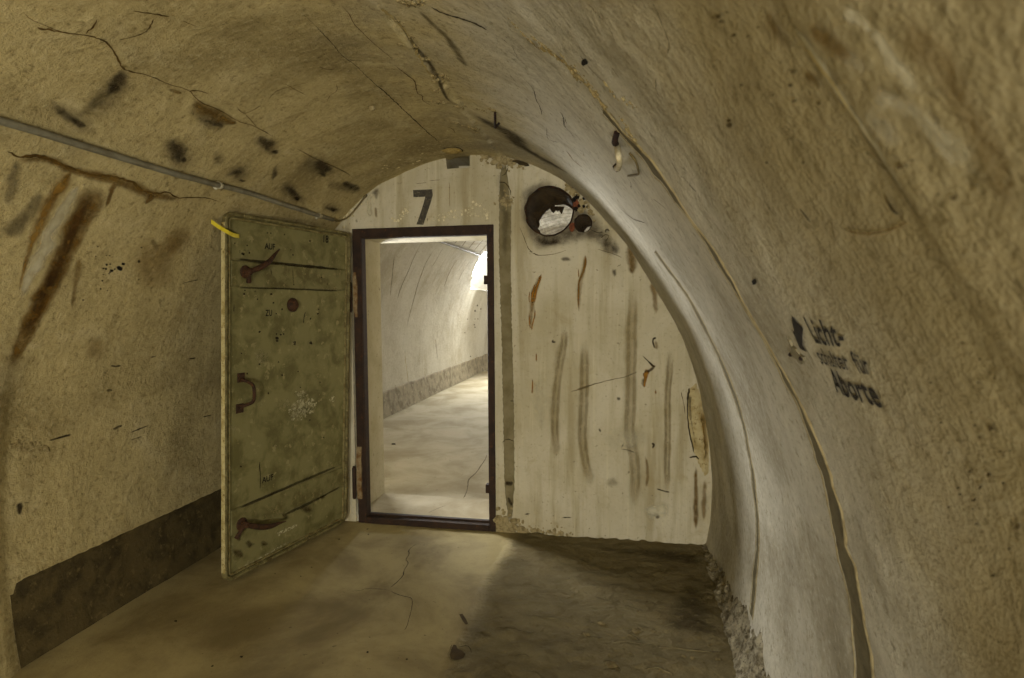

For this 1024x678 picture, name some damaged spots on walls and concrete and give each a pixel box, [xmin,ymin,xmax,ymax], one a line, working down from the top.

crack [26,11,455,142]
crack [8,151,219,204]
rust [11,174,116,360]
rust [529,275,541,329]
spalling [493,507,573,537]